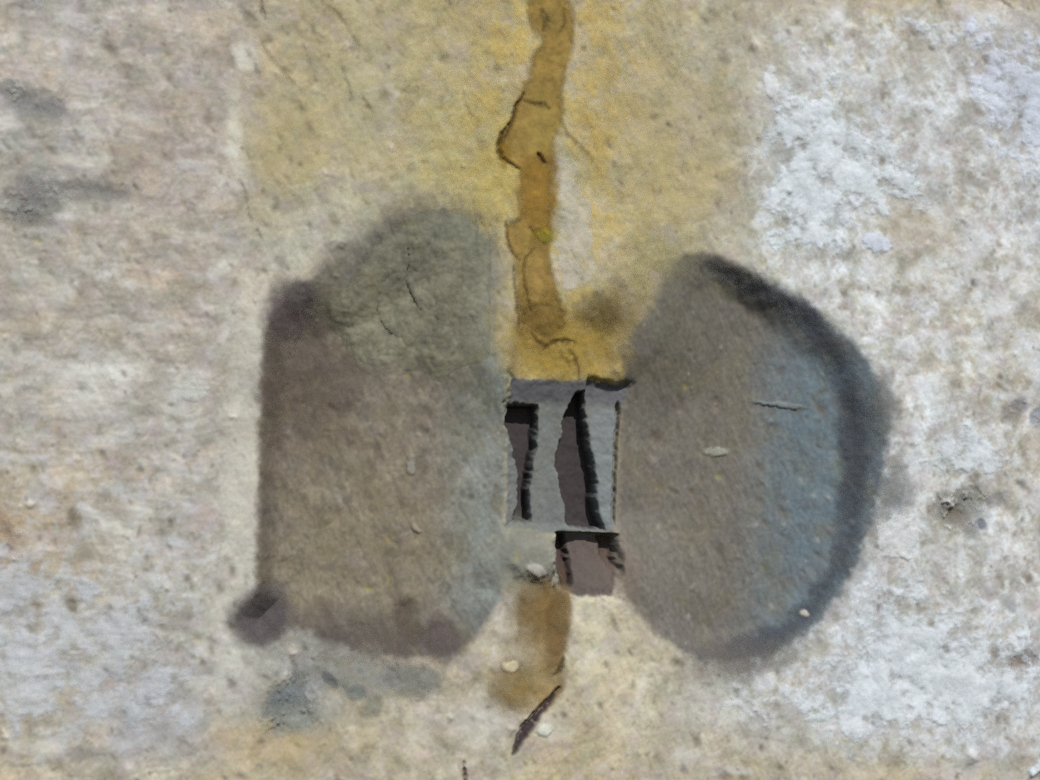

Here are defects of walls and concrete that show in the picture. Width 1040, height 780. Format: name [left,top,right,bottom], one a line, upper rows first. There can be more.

crack [497,0,583,362]
peeling [527,564,547,578]
crack [512,583,571,753]